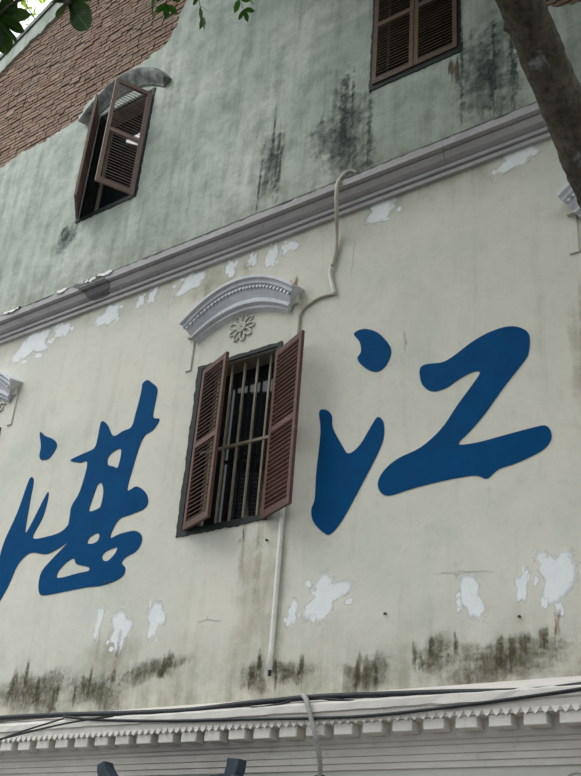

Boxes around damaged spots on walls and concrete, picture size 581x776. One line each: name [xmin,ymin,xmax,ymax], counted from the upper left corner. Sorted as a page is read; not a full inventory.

leakage [460,24,517,112]
leakage [312,82,372,177]
peeling [225,240,300,278]
peeling [9,322,75,365]
peeling [284,572,353,628]
peeling [455,574,486,621]
peeling [515,550,576,617]
leakage [2,663,115,713]
peeling [93,604,133,655]
leakage [131,654,182,684]
leakage [413,637,457,669]
leakage [465,629,557,683]